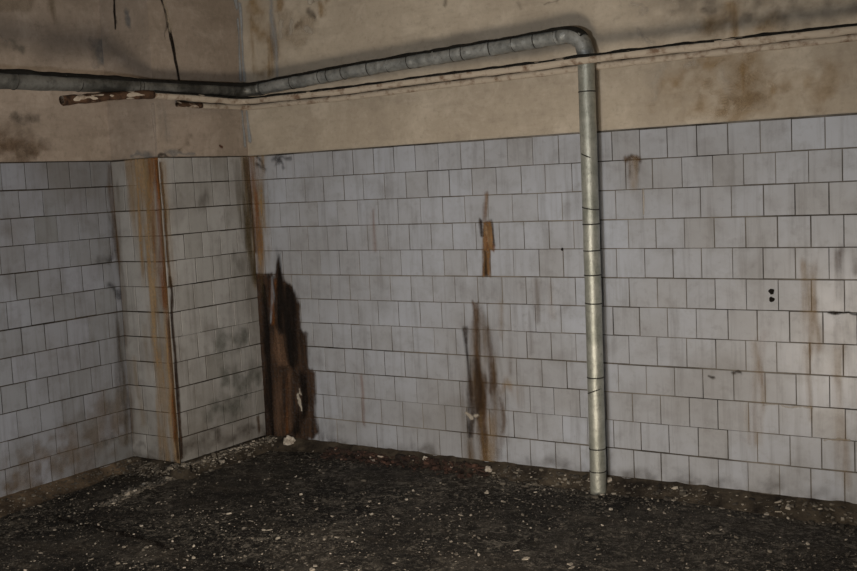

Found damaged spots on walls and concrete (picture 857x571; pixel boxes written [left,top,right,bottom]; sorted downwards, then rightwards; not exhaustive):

crack [161,0,180,80]
corrosion [130,153,183,464]
corrosion [243,187,265,281]
spalling [256,260,318,440]
corrosion [463,303,495,461]